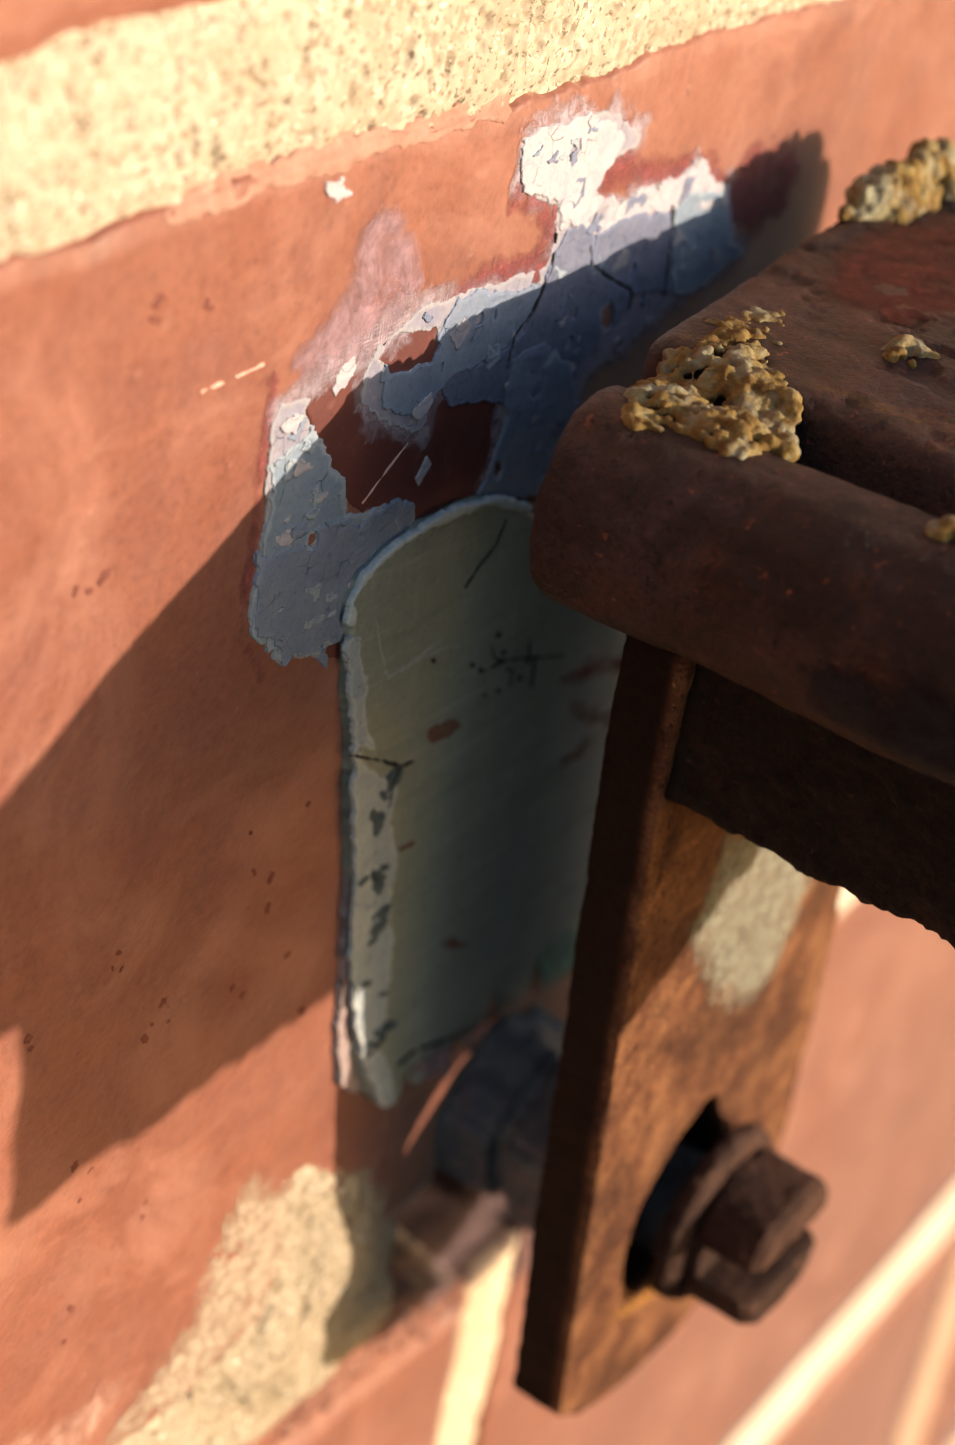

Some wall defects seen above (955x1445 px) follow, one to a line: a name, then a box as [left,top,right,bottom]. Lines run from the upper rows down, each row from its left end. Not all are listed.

spalling [165,94,512,225]
peeling [247,110,744,1108]
rust [613,1286,658,1319]